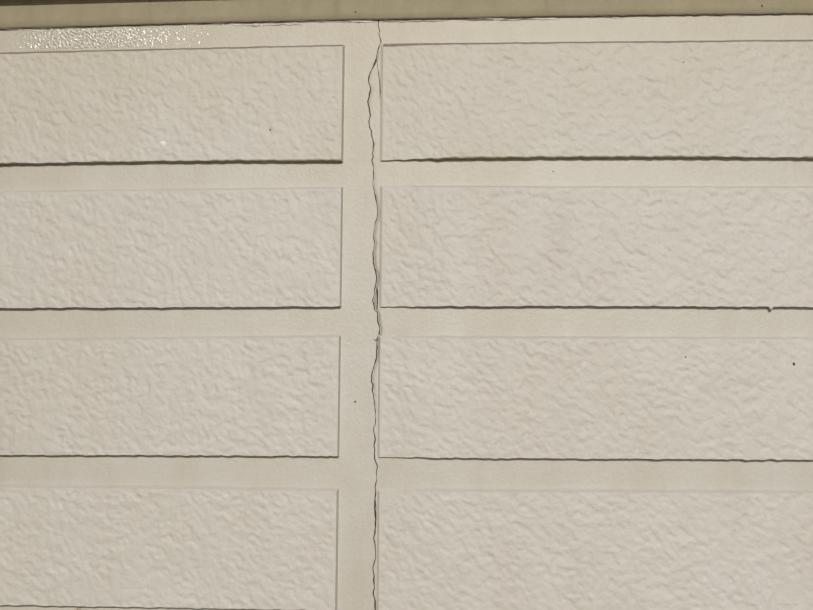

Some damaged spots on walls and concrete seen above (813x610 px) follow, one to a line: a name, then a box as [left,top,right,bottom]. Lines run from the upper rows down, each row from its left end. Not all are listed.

crack [0,22,141,30]
crack [163,14,699,610]